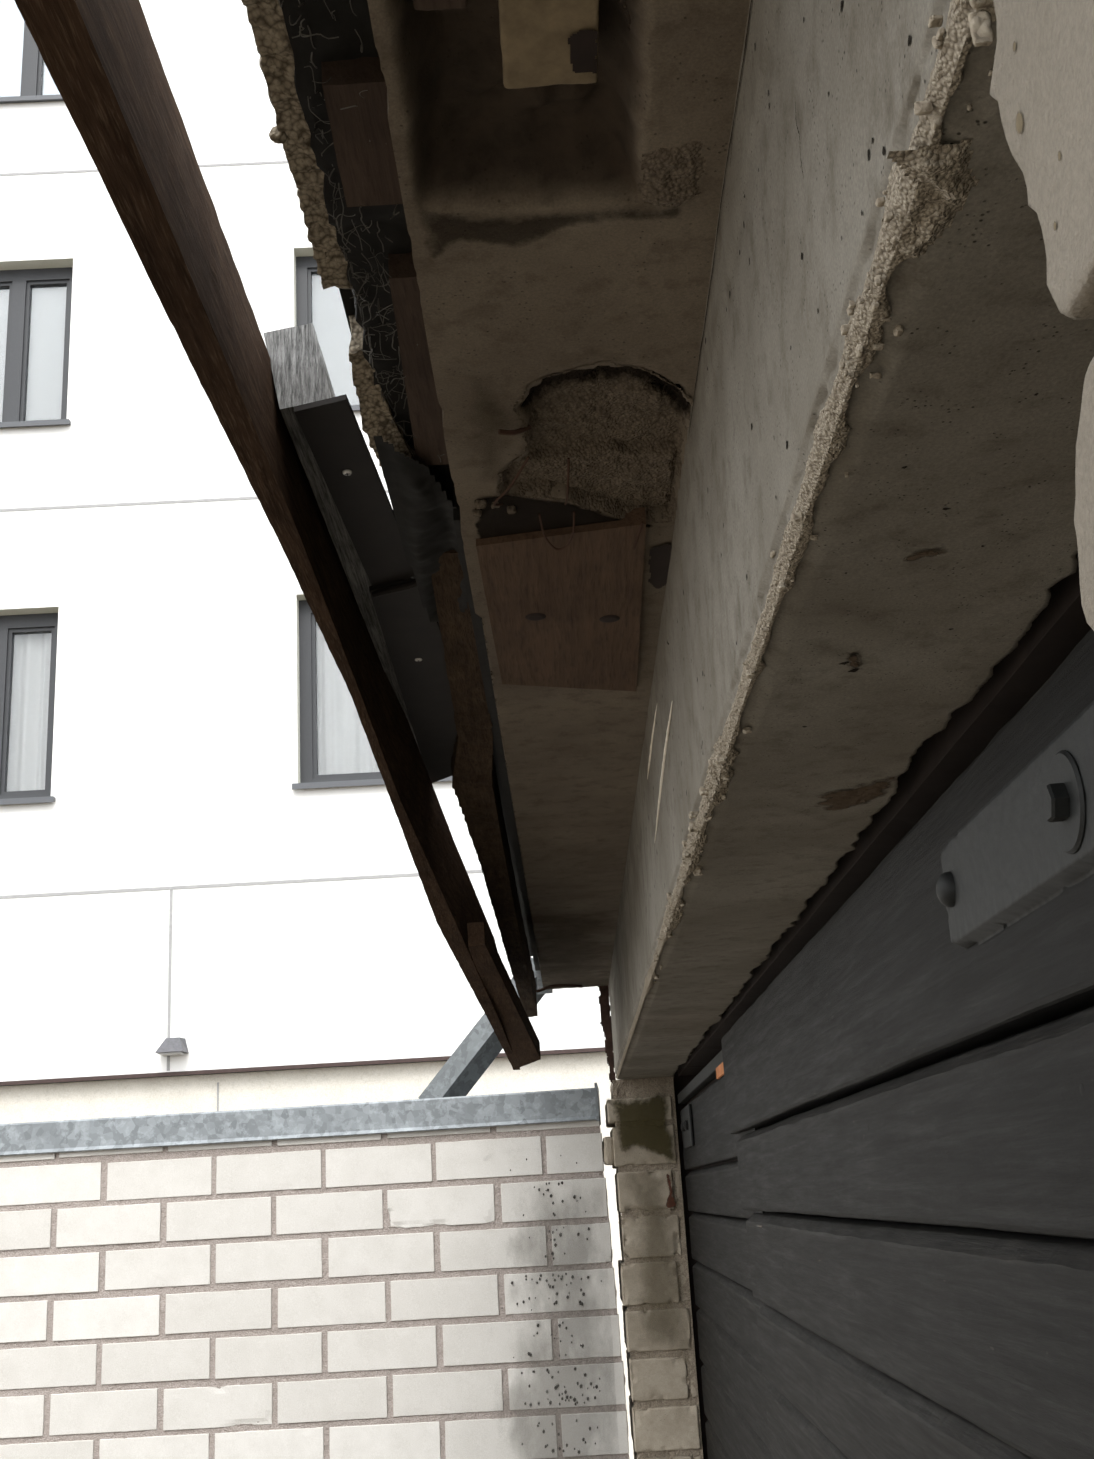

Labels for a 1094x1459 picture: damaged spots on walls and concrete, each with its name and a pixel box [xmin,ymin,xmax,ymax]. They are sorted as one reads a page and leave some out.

spalling [473,361,693,551]
spalling [616,0,997,1079]
damp [502,1182,602,1454]